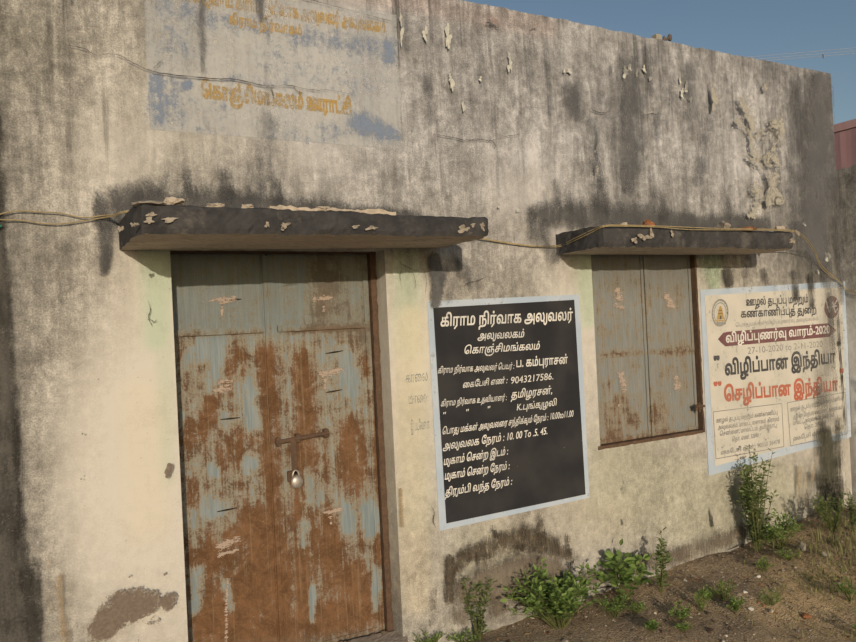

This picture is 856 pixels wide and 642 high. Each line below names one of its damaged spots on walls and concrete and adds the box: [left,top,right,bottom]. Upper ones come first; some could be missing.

crack [67,45,357,99]
water stain [564,85,580,118]
water stain [620,56,641,191]
peeling [734,95,789,219]
spalling [117,212,178,232]
water stain [529,179,771,262]
water stain [724,268,734,287]
water stain [788,72,845,510]
water stain [0,171,43,642]
flaking render [87,576,178,642]